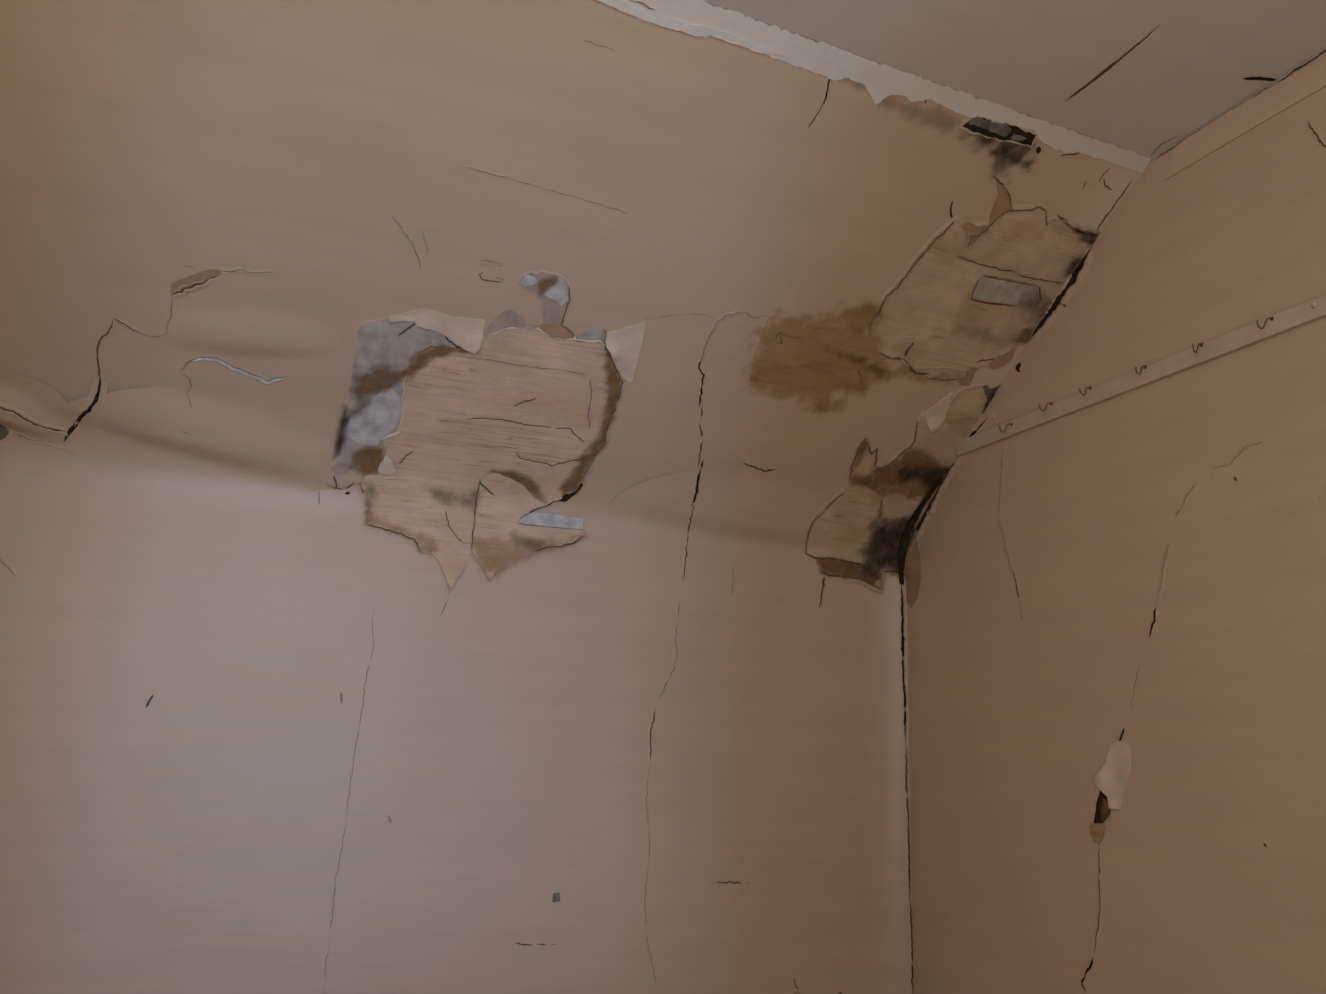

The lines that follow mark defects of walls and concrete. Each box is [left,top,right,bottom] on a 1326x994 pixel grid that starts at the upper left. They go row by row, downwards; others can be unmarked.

crack [0,265,288,455]
crack [323,614,374,994]
peeling [318,269,646,615]
crack [644,310,778,993]
peeling [801,176,1100,611]
crack [897,410,1022,993]
damp [977,130,1031,165]
crack [1028,242,1095,347]
crack [1079,844,1103,993]
crack [1118,440,1262,742]
crack [1232,50,1326,110]